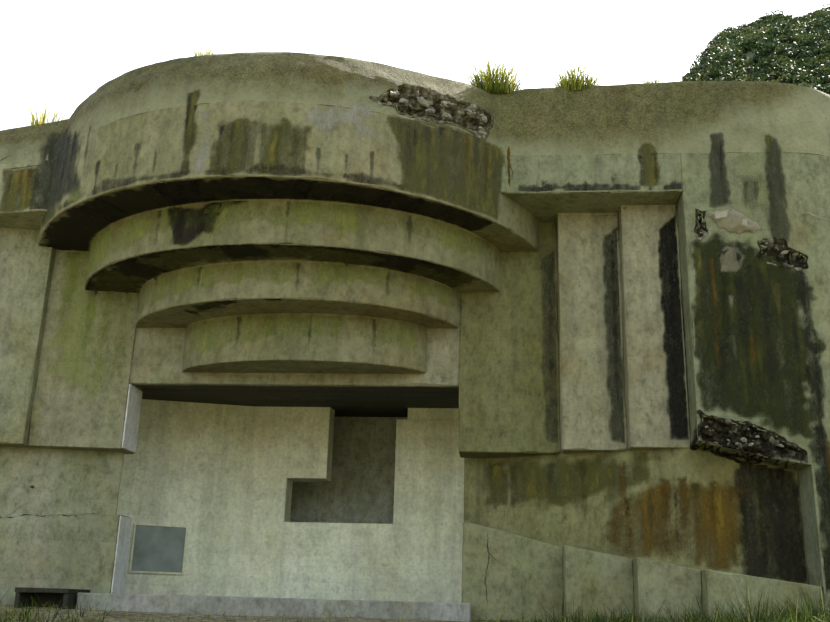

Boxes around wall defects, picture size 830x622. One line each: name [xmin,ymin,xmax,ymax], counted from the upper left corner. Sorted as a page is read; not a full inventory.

spalling [369,84,494,141]
water stain [1,91,504,323]
spalling [694,209,708,240]
water stain [709,133,730,206]
water stain [765,135,790,242]
spalling [757,238,809,271]
spalling [690,410,808,469]
crack [0,502,102,518]
corrosion [607,477,747,569]